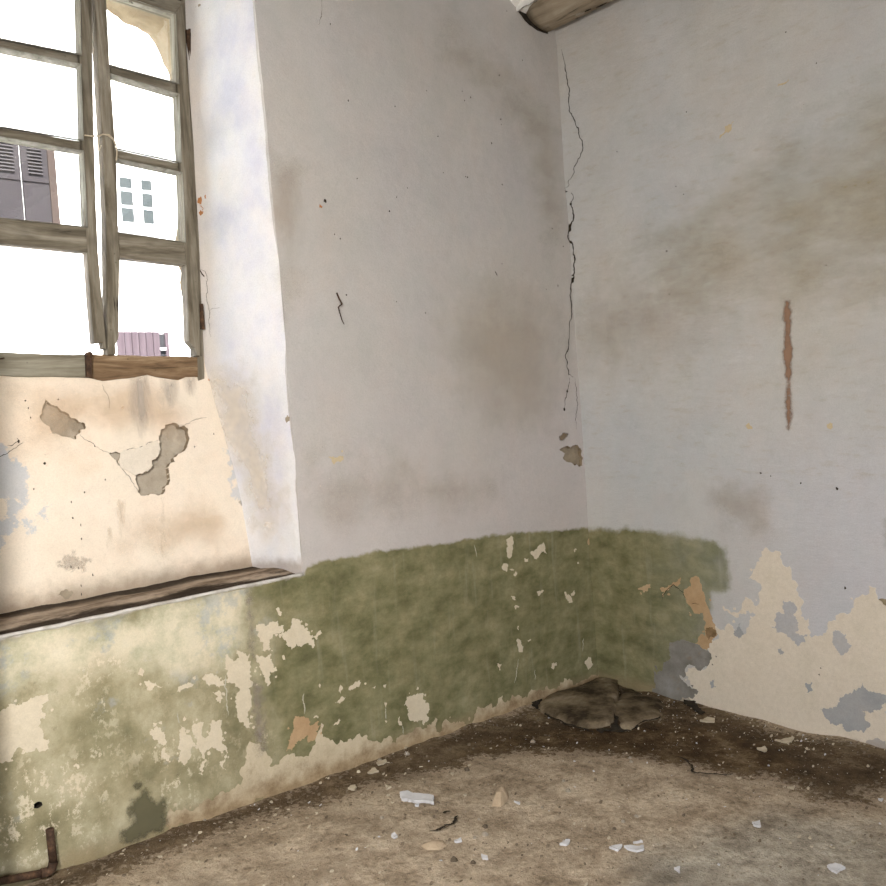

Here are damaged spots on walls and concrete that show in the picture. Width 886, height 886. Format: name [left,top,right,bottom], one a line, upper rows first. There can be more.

crack [561,49,583,421]
corrosion [783,301,793,430]
flaking render [40,399,86,439]
flaking render [109,423,189,496]
flaking render [560,445,583,467]
peeling [502,536,517,576]
peeling [524,543,546,562]
peeling [638,548,886,743]
peeling [138,668,161,690]
peeling [0,694,54,770]
peeling [150,717,229,775]